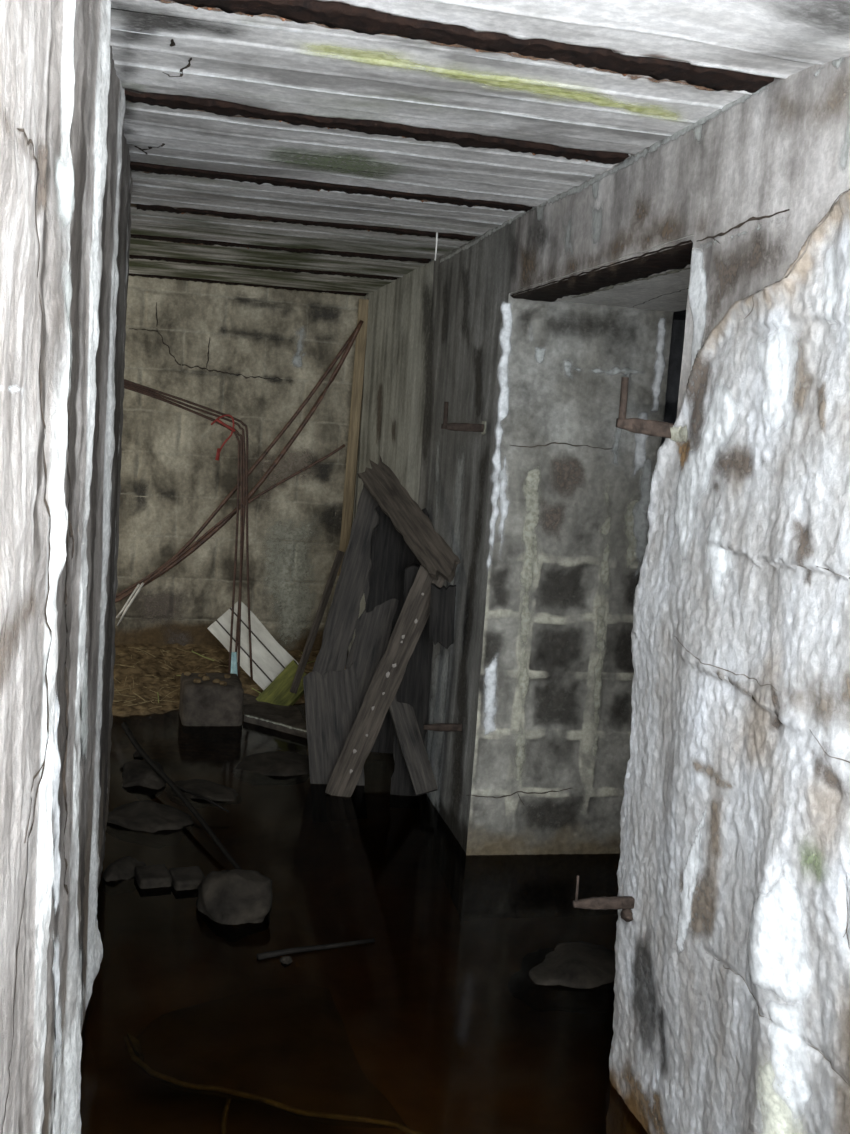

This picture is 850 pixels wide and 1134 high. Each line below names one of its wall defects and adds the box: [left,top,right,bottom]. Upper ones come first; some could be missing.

crack [696,209,790,244]
crack [740,189,850,319]
crack [129,302,292,381]
water stain [564,318,665,420]
water stain [675,234,781,557]
water stain [758,330,826,429]
water stain [427,303,531,820]
water stain [625,433,651,603]
water stain [707,518,731,595]
water stain [795,523,813,584]
crack [676,637,776,690]
water stain [676,801,720,952]